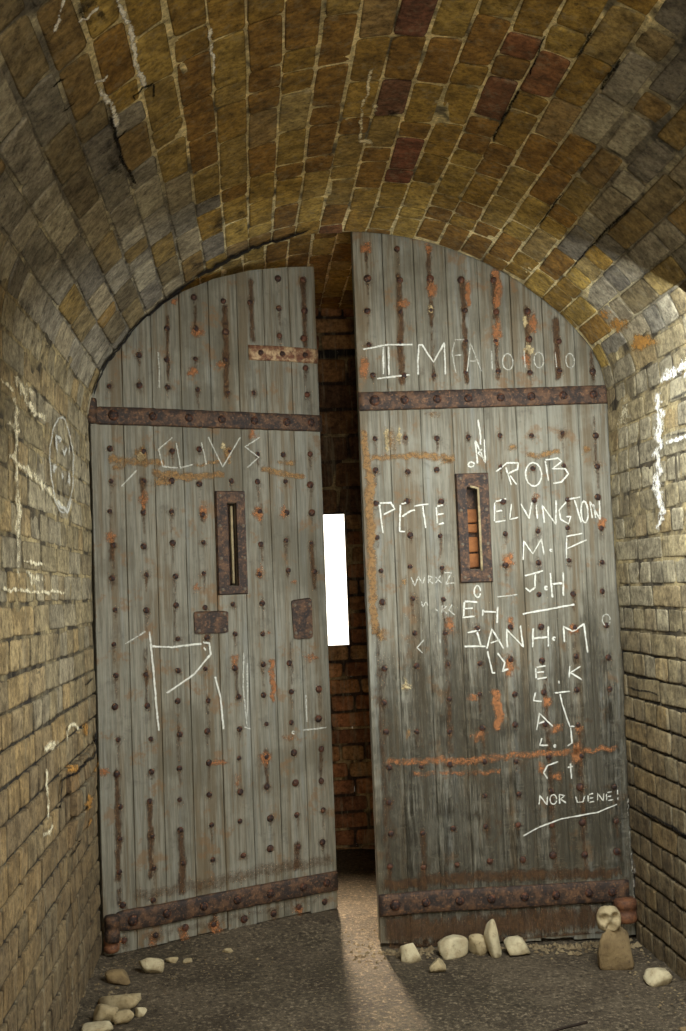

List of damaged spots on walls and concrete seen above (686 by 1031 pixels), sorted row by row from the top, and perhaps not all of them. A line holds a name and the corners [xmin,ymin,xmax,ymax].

crack [133,83,155,100]
crack [493,36,545,142]
crack [576,31,592,58]
crack [600,59,621,90]
crack [110,117,136,184]
corrosion [396,274,410,385]
corrosion [425,243,437,340]
corrosion [460,281,471,384]
corrosion [490,270,503,380]
corrosion [552,317,562,380]
corrosion [381,617,621,891]
corrosion [385,905,603,948]